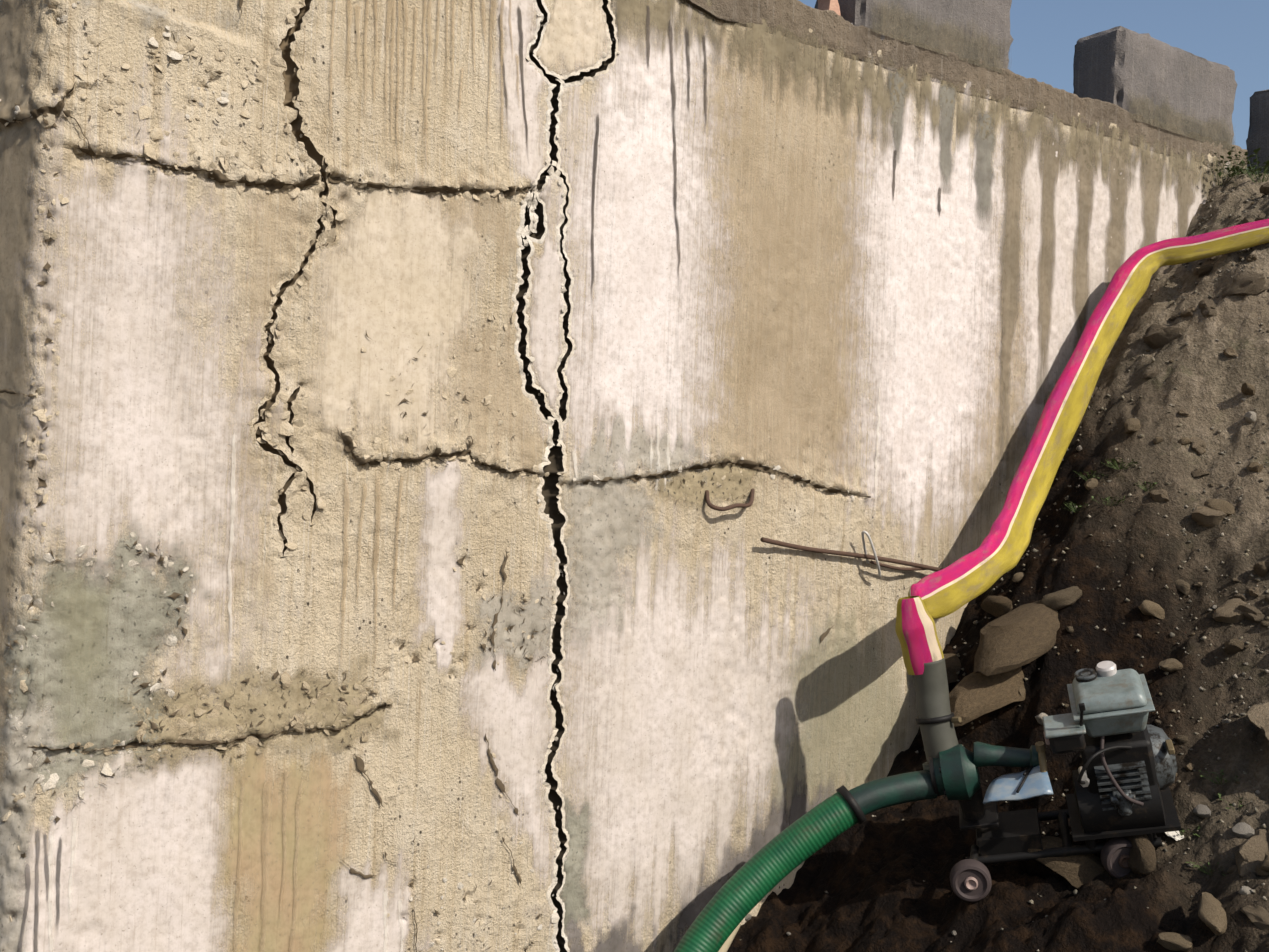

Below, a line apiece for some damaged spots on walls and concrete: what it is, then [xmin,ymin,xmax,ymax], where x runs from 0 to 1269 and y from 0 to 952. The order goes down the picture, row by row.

damp [591,116,599,286]
damp [610,0,1241,448]
crack [0,0,871,952]
damp [650,426,671,480]